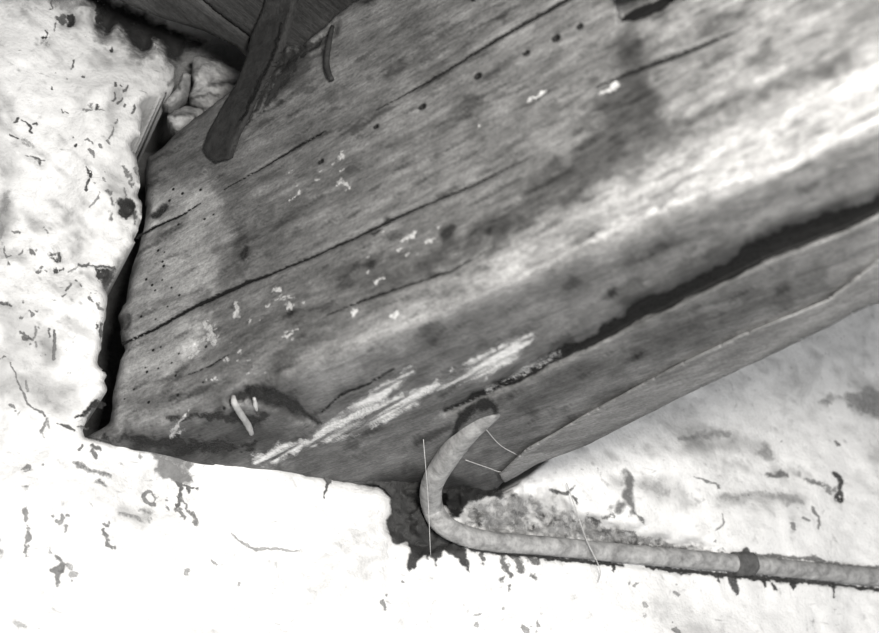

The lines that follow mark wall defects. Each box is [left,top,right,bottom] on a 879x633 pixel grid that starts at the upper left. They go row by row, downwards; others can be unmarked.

spalling [84,166,138,224]
spalling [95,268,114,286]
crack [122,162,520,345]
spalling [806,471,844,503]
spalling [446,485,673,548]